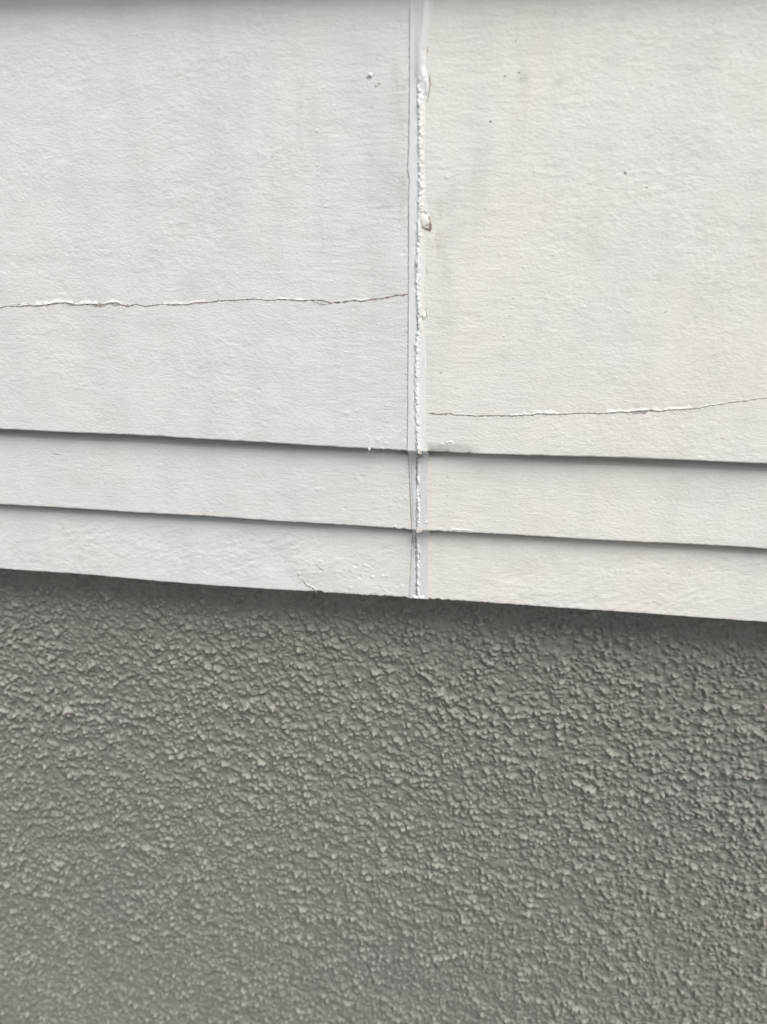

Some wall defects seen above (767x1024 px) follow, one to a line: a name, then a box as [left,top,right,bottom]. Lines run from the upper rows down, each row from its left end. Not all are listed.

crack [0,11,767,596]